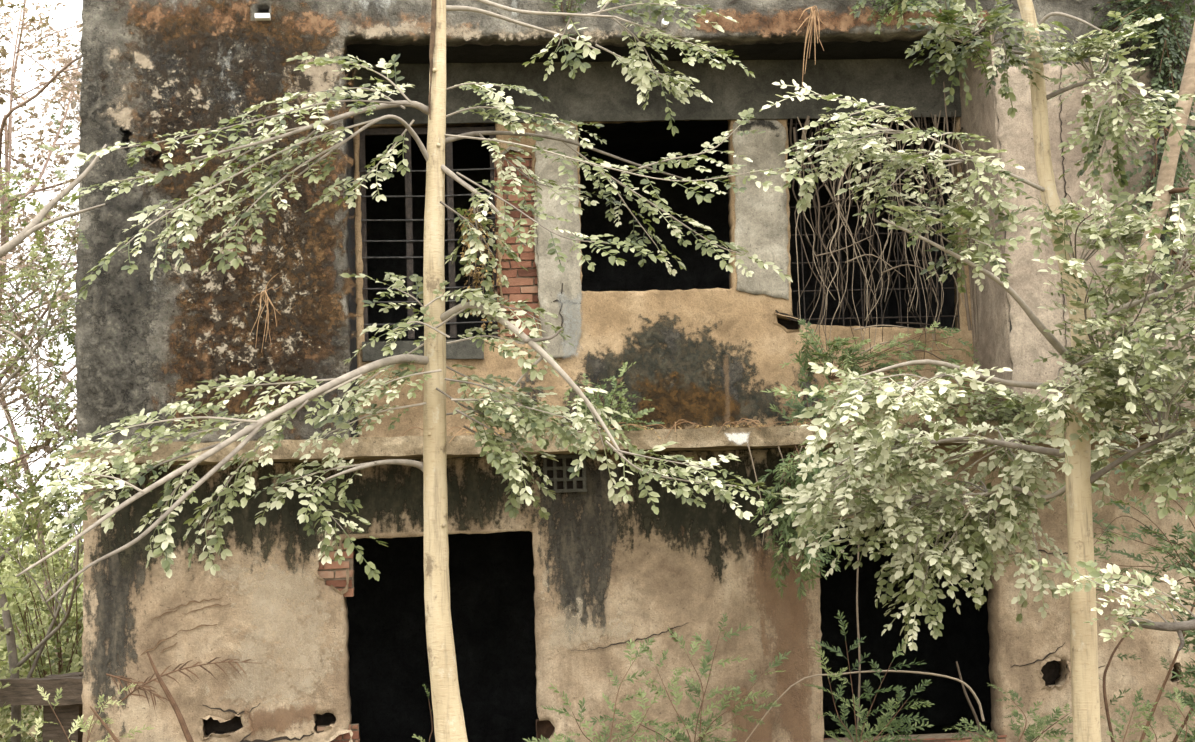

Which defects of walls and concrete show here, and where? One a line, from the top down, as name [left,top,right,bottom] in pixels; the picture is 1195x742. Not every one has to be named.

leakage [348,19,431,39]
leakage [446,23,629,41]
leakage [61,25,362,436]
flaking render [493,146,539,344]
leakage [559,293,821,444]
flaking render [313,543,355,597]
leakage [532,453,632,641]
leakage [78,539,146,742]
crack [571,623,687,651]
spalling [1036,656,1071,691]
spalling [197,713,243,741]
flaking render [310,712,360,742]